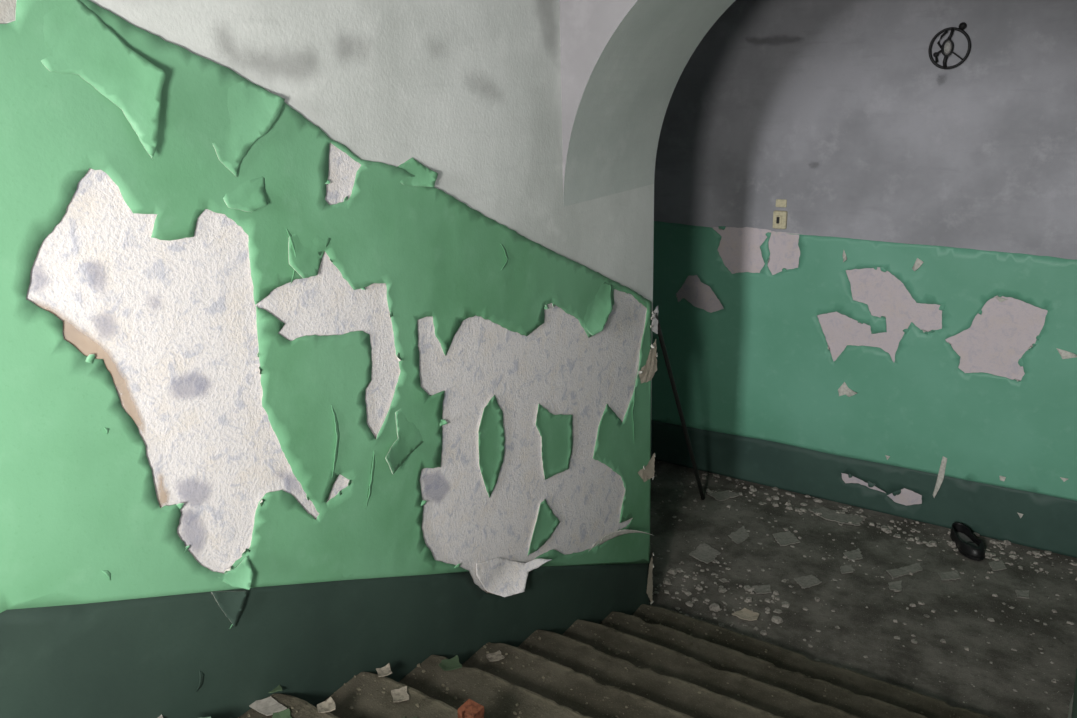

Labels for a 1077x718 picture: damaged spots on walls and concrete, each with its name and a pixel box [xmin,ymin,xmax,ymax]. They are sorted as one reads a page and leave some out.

flaking render [0,0,16,24]
peeling [41,0,166,160]
peeling [397,158,438,187]
peeling [712,226,800,275]
peeling [676,275,724,313]
peeling [817,250,1048,382]
peeling [26,80,424,627]
peeling [418,282,658,597]
peeling [841,456,947,506]